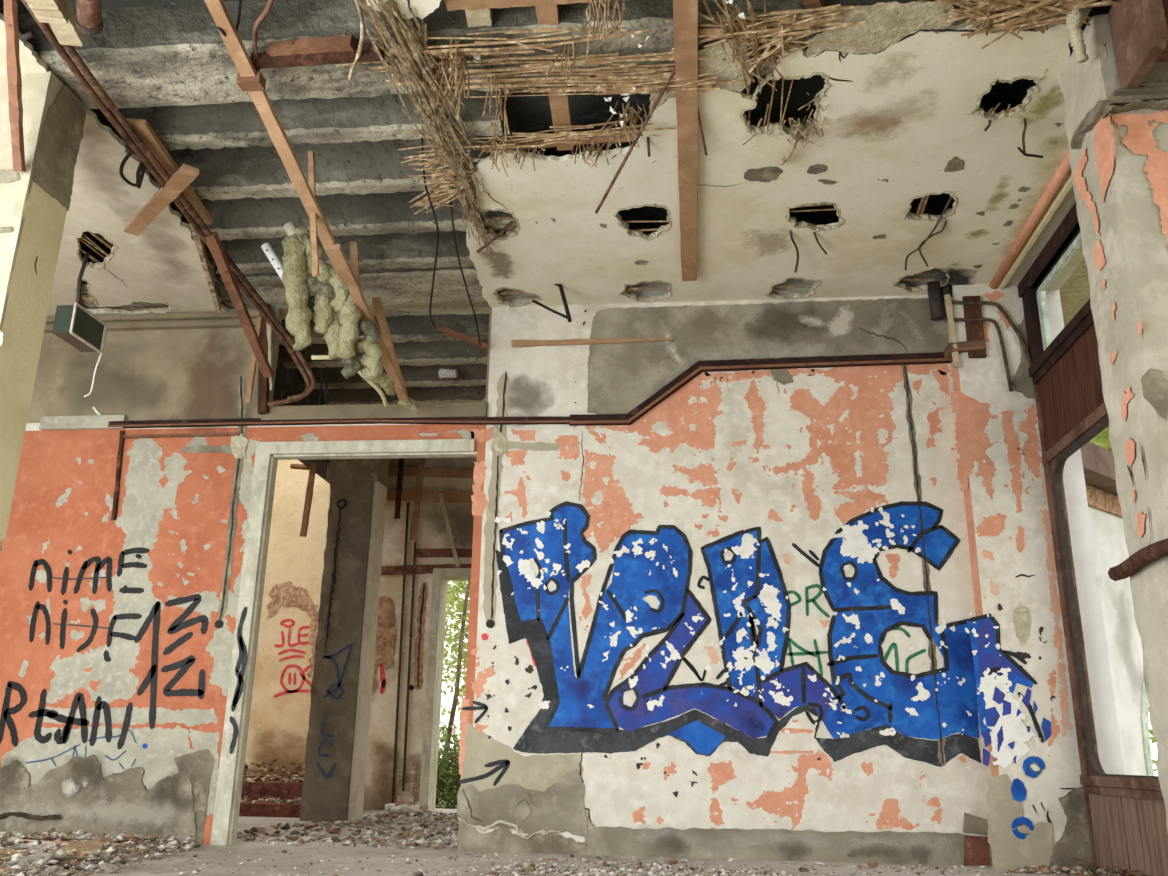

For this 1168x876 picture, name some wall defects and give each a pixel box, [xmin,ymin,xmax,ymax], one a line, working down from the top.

flaking render [457,165,478,208]
peeling [1049,80,1168,320]
water stain [700,306,854,360]
flaking render [1121,369,1168,422]
peeling [1125,437,1135,474]
peeling [1132,490,1145,537]
flaking render [419,291,1093,868]